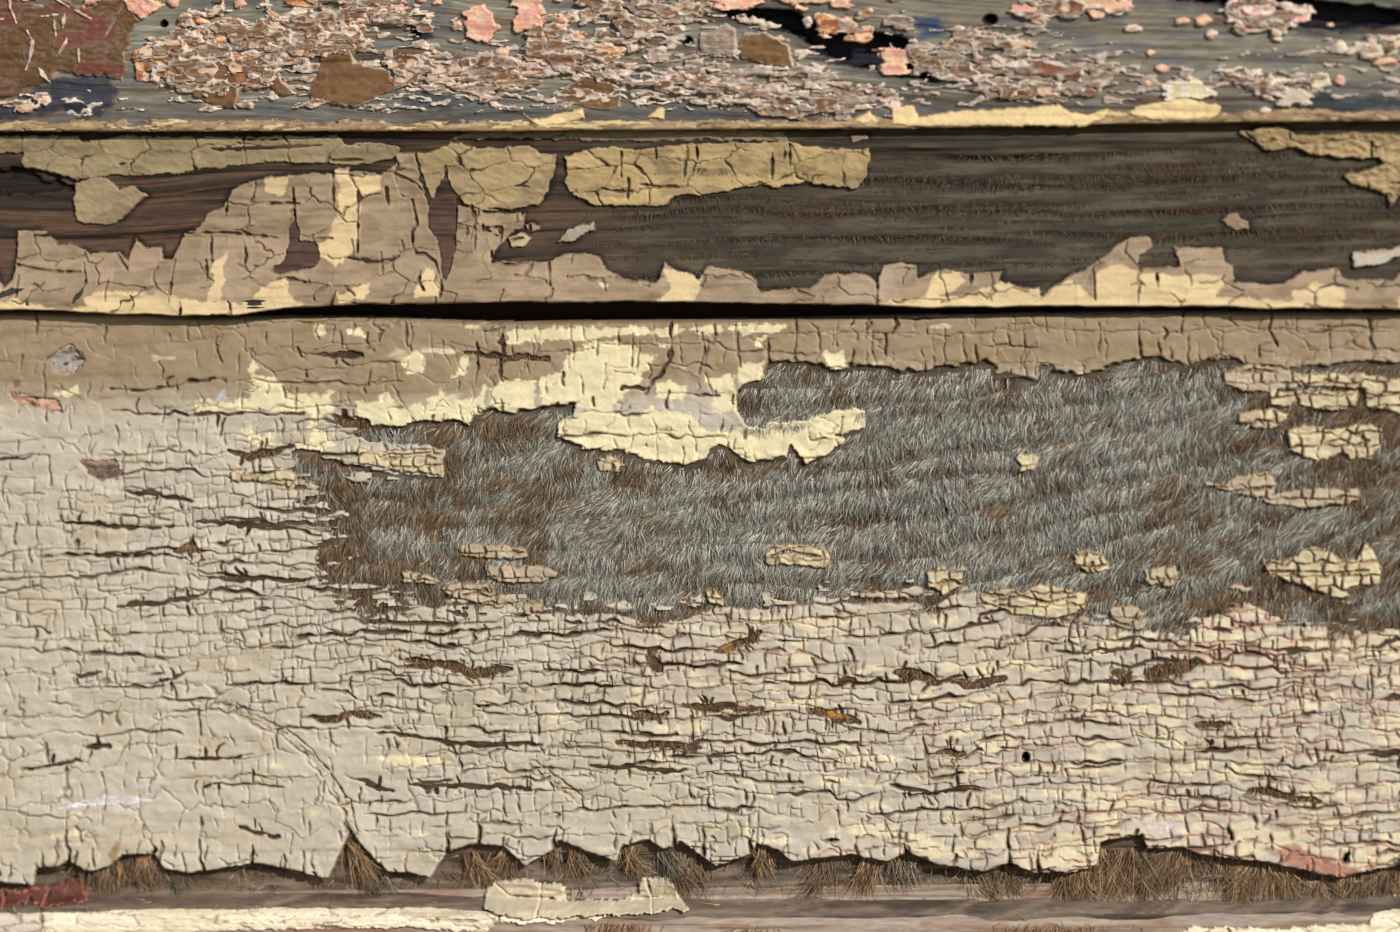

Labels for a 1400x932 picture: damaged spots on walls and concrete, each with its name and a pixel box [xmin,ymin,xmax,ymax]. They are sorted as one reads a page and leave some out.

peeling [0,0,1400,207]
peeling [557,221,596,243]
peeling [1221,212,1249,231]
peeling [1351,245,1400,269]
crack [110,379,370,466]
crack [63,489,322,616]
crack [404,657,512,687]
crack [590,623,766,774]
crack [889,661,1008,696]
crack [300,711,542,795]
peeling [0,876,689,932]
peeling [1179,894,1400,932]